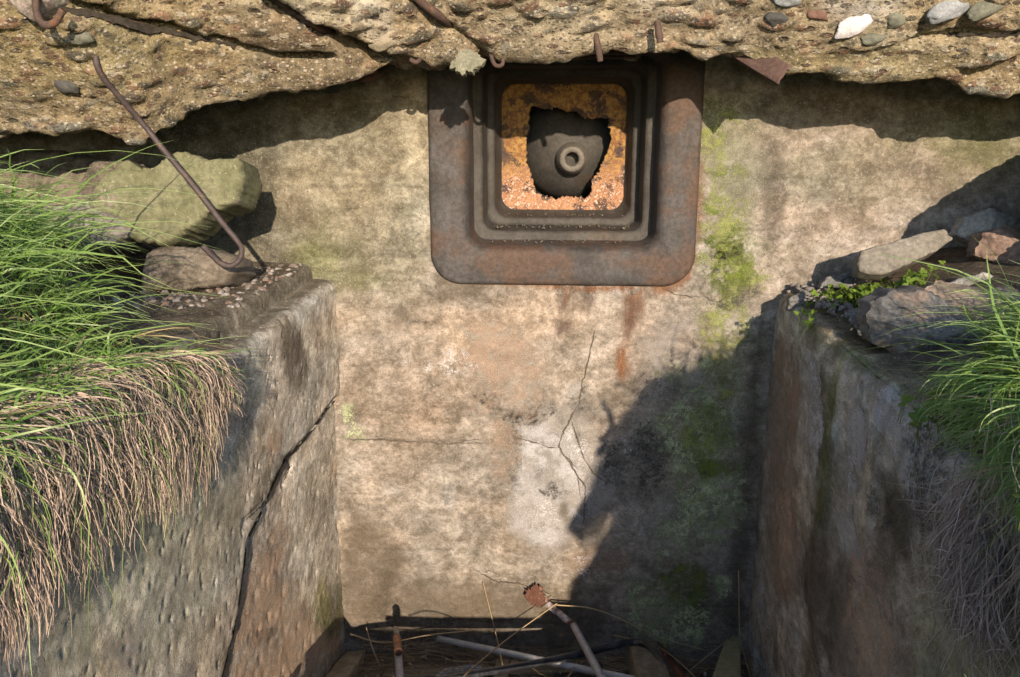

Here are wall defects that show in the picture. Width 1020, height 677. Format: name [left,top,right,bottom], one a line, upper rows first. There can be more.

crack [222,383,340,677]
damp [518,426,593,545]
crack [513,331,605,524]